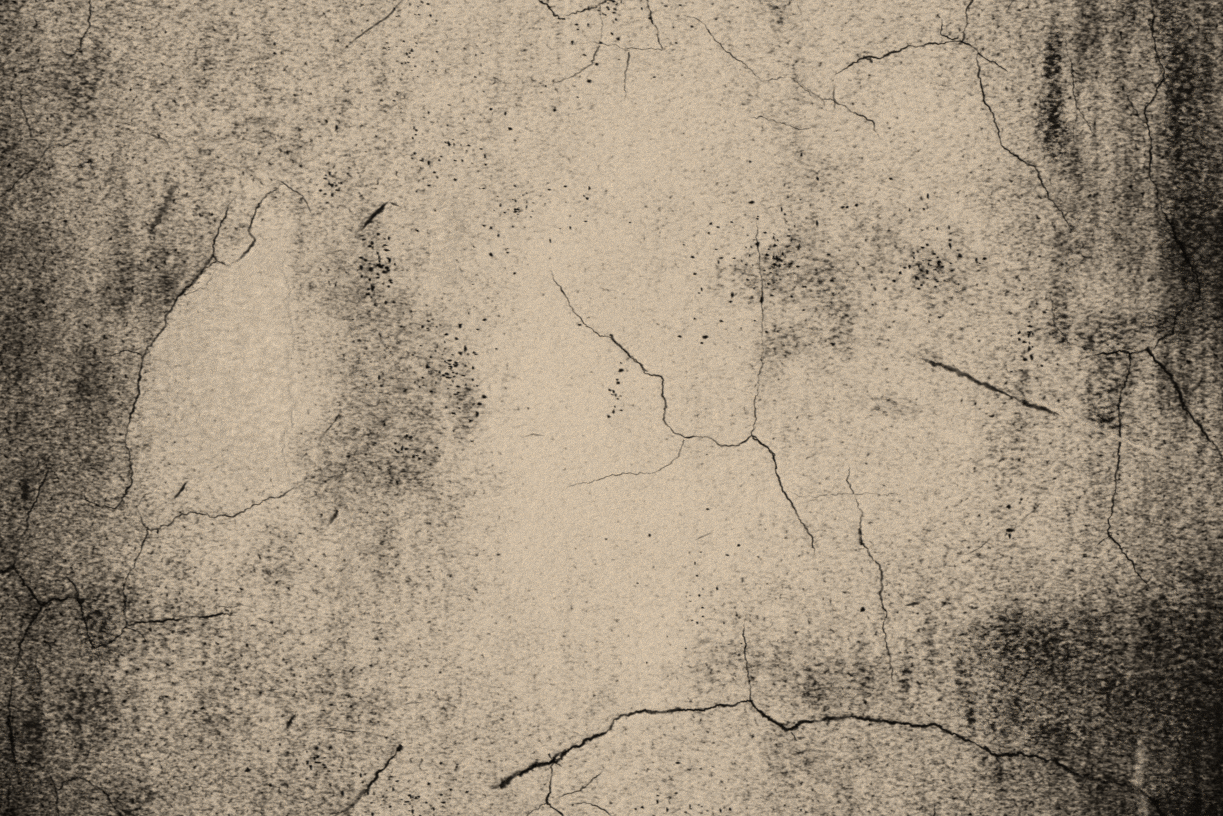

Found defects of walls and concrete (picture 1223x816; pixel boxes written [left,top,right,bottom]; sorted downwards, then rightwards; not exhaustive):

crack [0,100,91,197]
crack [539,0,662,96]
crack [696,0,1069,226]
crack [0,181,311,816]
crack [553,228,897,679]
crack [499,620,1183,816]